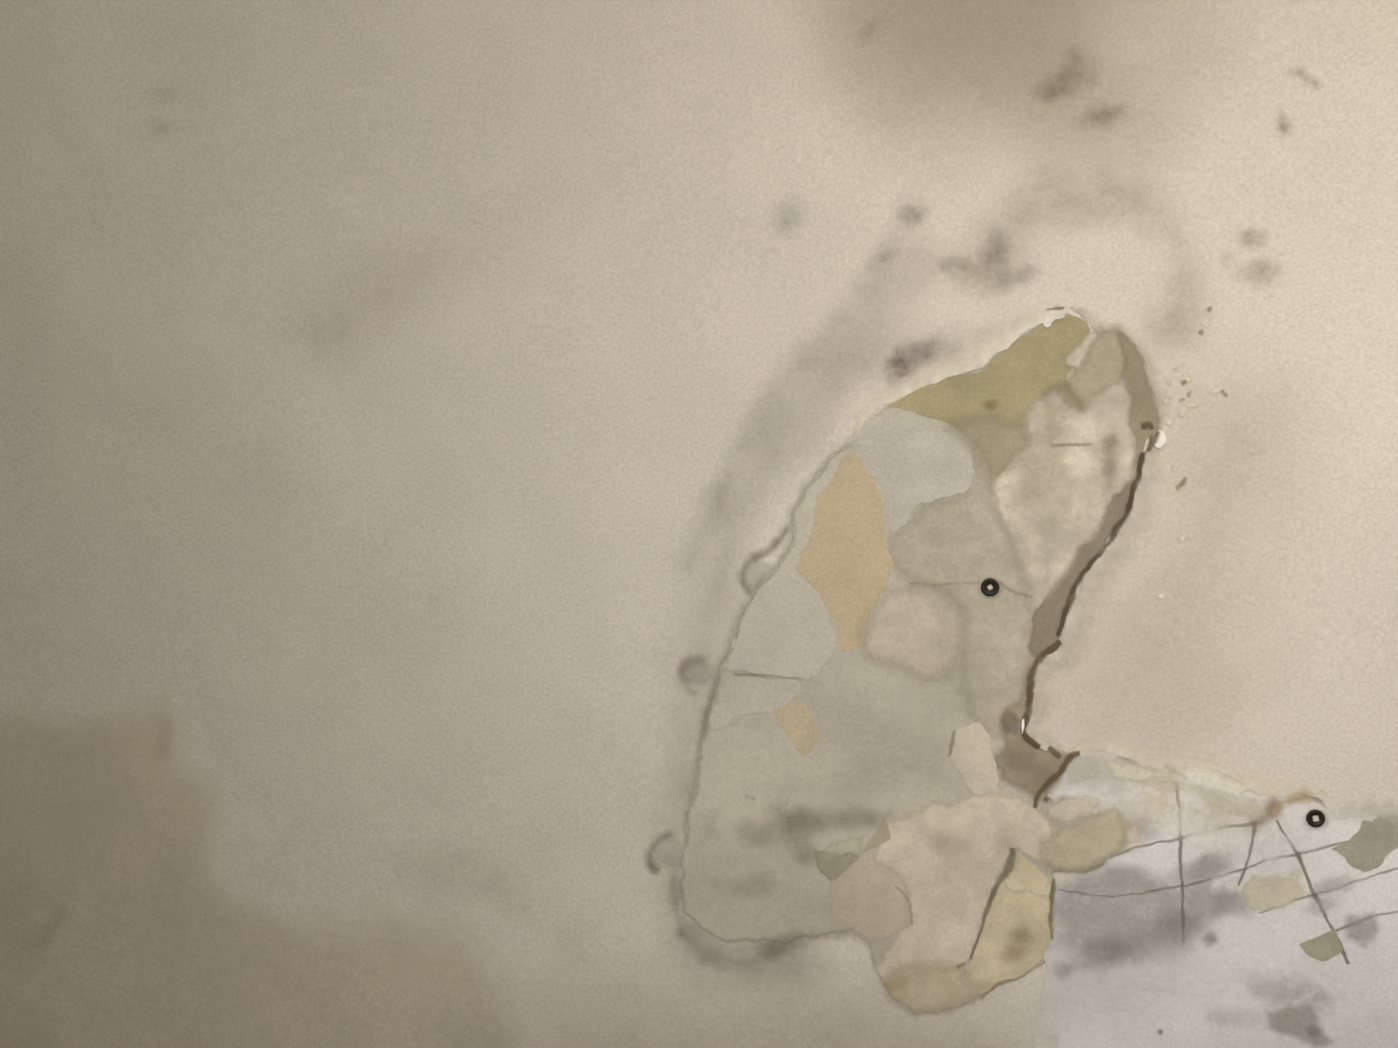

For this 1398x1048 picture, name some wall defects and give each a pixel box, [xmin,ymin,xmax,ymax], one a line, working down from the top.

peeling [681,306,1398,1048]
crack [1021,423,1160,808]
crack [1104,782,1384,964]